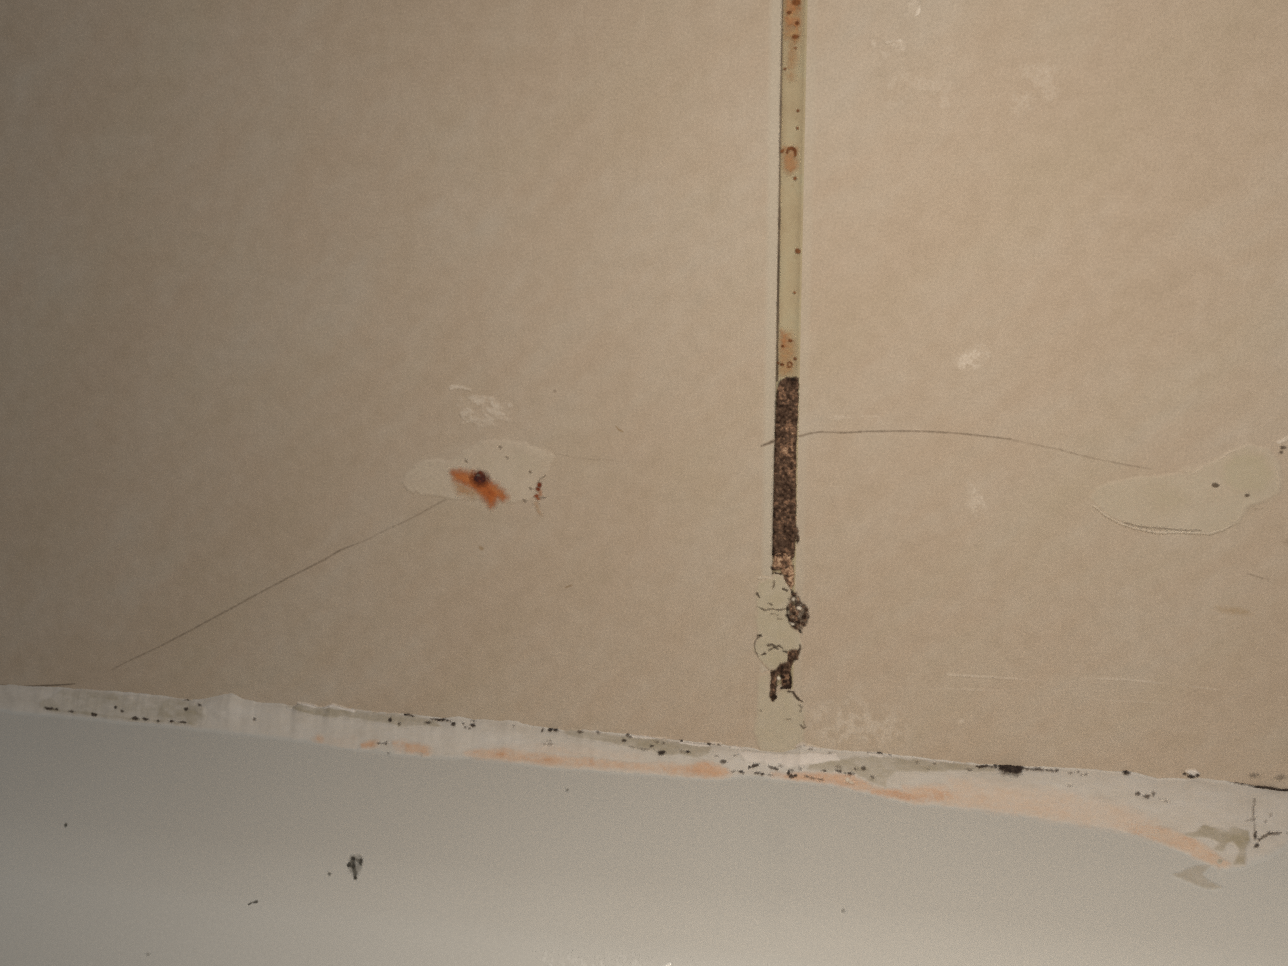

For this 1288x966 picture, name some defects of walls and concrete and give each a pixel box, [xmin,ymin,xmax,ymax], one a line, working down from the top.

corrosion [784,0,801,70]
corrosion [781,147,797,180]
crack [760,429,1152,470]
corrosion [451,470,505,507]
crack [111,498,448,670]
damp [310,713,475,758]
damp [461,728,1233,874]
peeling [1171,824,1252,892]